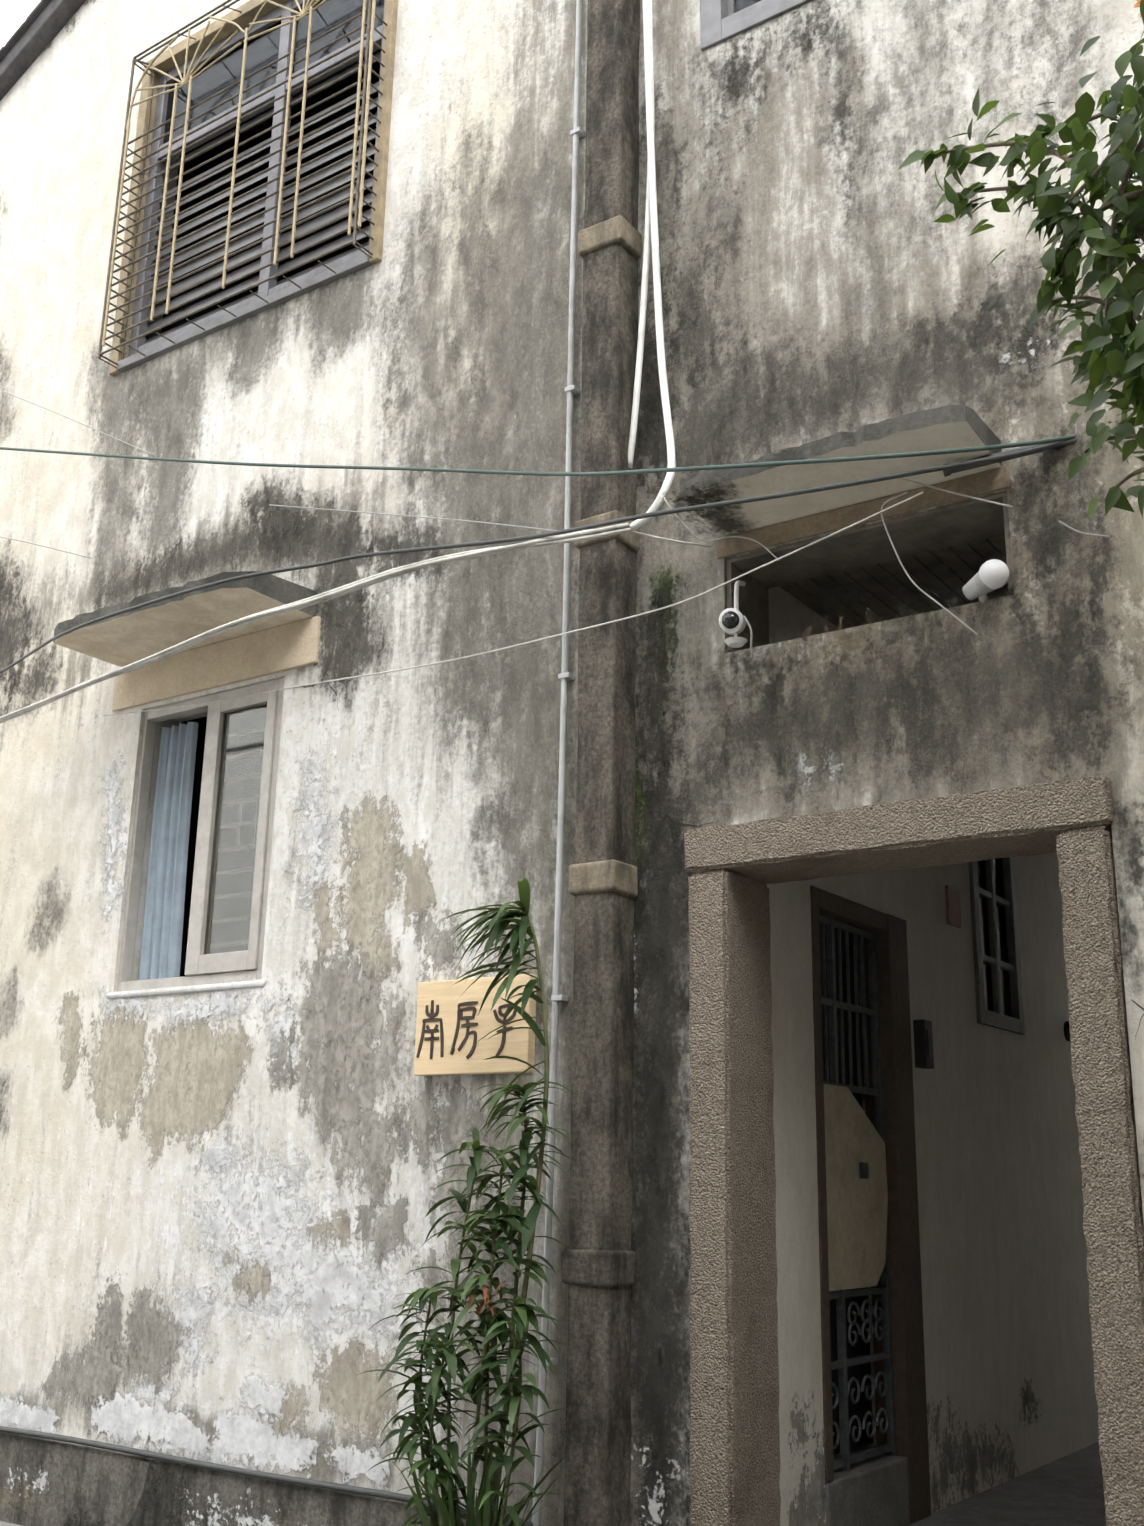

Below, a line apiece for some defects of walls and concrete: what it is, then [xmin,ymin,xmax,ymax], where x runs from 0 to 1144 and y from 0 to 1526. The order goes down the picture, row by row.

water stain [1028,2,1101,130]
water stain [637,0,1063,541]
water stain [0,351,13,434]
water stain [0,540,63,715]
water stain [90,135,583,1021]
water stain [630,429,1123,1526]
peeling [0,751,521,1491]
peeling [6,1467,49,1500]
peeling [182,1489,307,1526]
peeling [631,1444,688,1526]